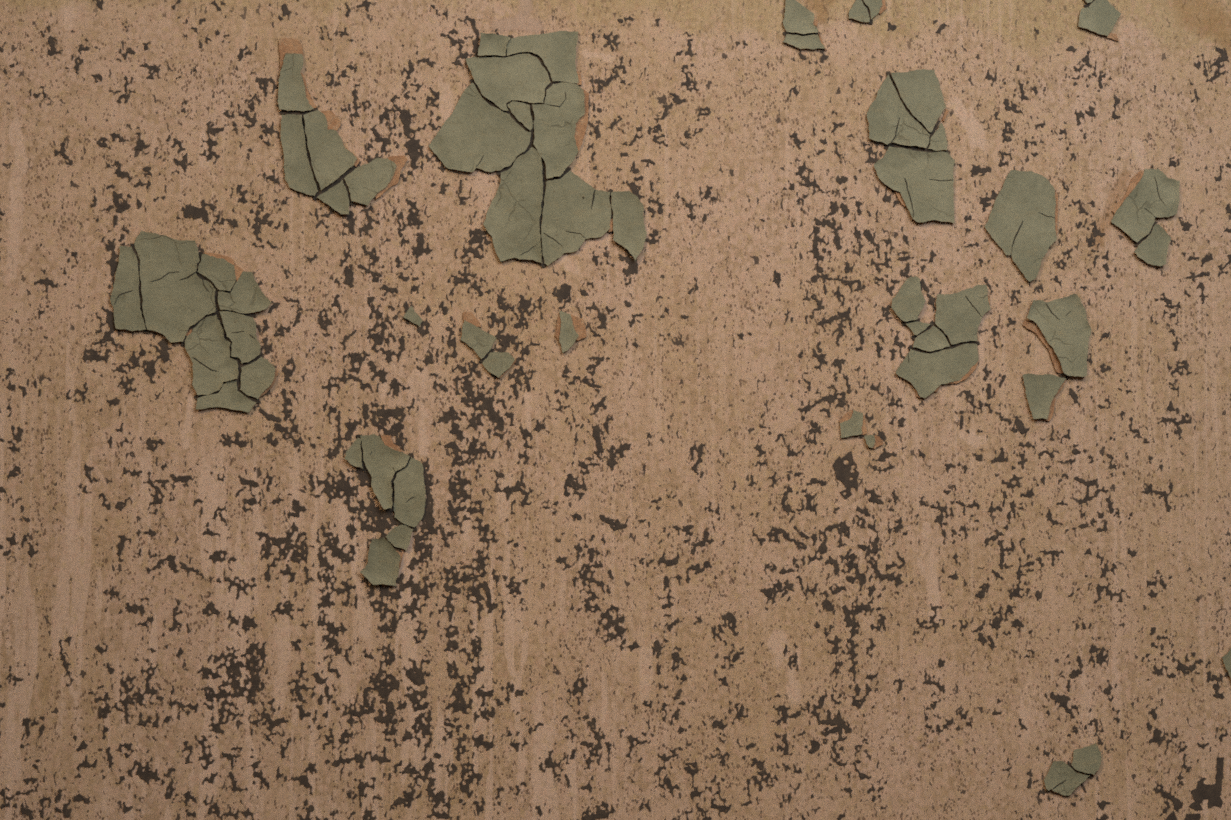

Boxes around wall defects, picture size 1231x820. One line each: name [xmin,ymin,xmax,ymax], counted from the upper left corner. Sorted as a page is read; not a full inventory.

peeling [783,0,829,75]
peeling [1189,47,1229,113]
peeling [1111,157,1231,443]
peeling [0,0,725,820]
peeling [620,46,1133,820]
peeling [1141,482,1175,512]
peeling [1068,547,1172,607]
peeling [1139,627,1231,699]
peeling [1142,696,1231,820]